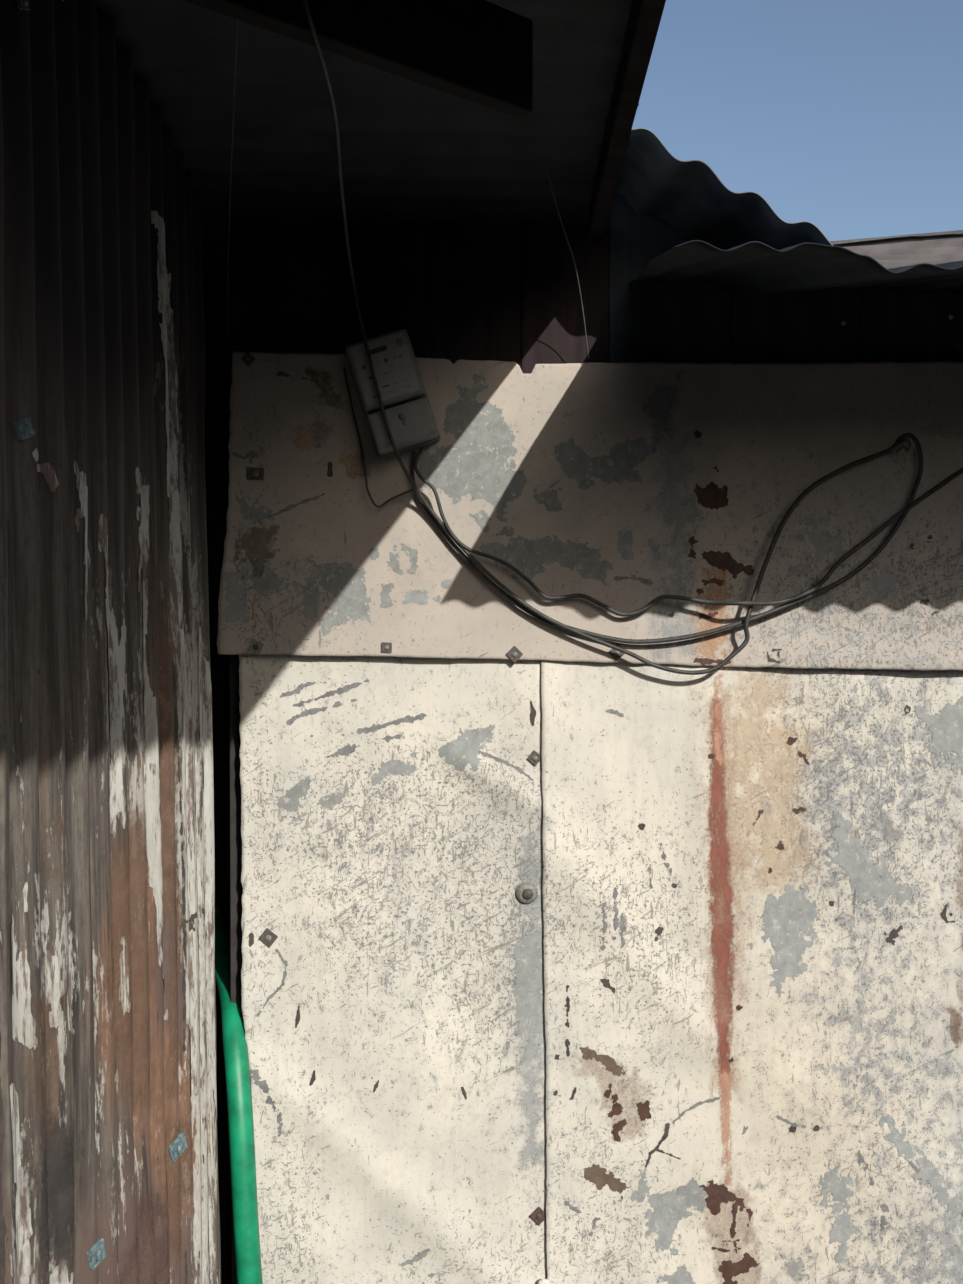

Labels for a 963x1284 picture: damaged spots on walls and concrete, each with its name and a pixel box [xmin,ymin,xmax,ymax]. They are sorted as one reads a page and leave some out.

peeling [32,449,59,492]
corrosion [694,466,729,509]
peeling [151,210,217,1128]
peeling [74,461,165,991]
corrosion [688,536,758,1284]
peeling [10,882,72,1050]
peeling [119,936,131,1017]
corrosion [580,1046,651,1142]
peeling [6,1082,33,1284]
corrosion [583,1163,629,1199]
peeling [49,1259,73,1284]